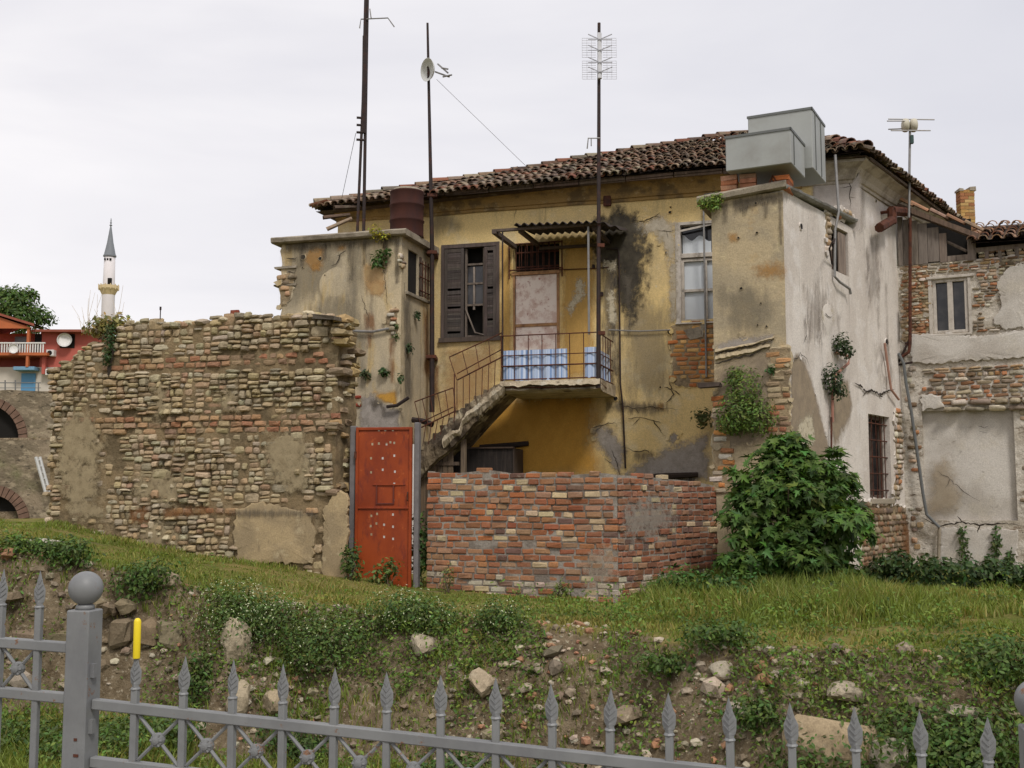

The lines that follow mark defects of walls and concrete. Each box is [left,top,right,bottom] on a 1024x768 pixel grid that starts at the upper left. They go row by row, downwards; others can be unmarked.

spalling [274,254,323,310]
water stain [589,205,652,377]
crack [595,382,680,474]
spalling [590,206,802,494]
crack [855,383,895,397]
flaking render [858,248,1024,570]
crack [926,473,1020,533]